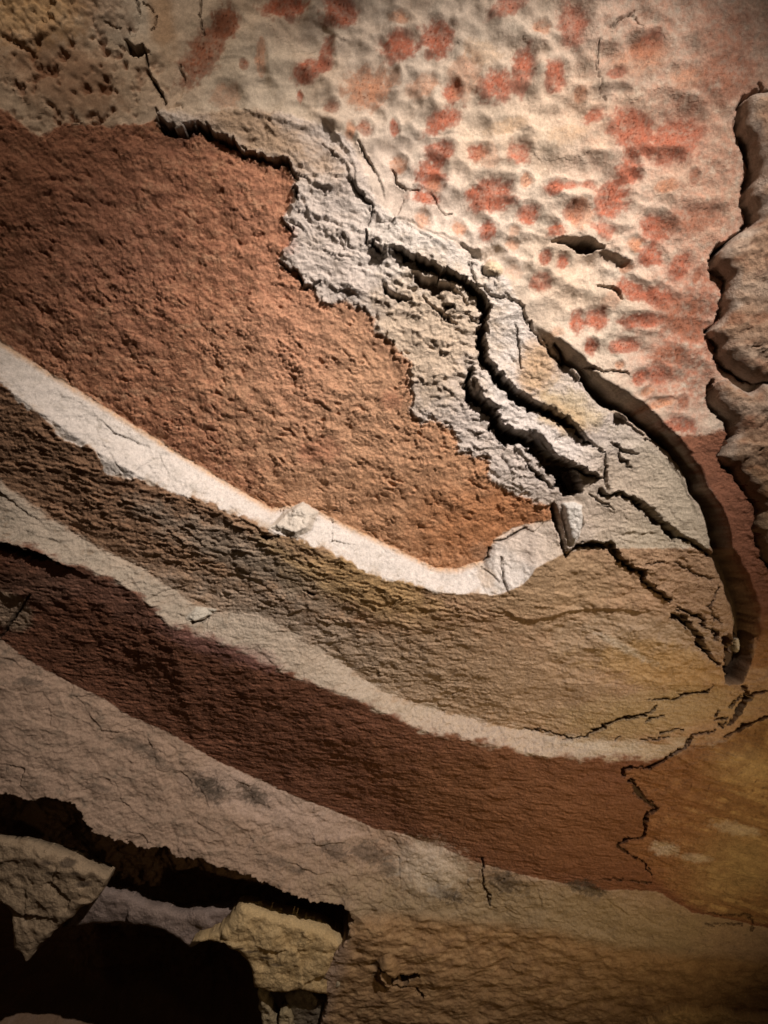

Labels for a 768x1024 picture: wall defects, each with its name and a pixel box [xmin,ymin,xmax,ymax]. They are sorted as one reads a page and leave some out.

crack [103,0,300,238]
spalling [0,108,558,569]
crack [277,259,321,291]
crack [321,81,768,886]
corrosion [517,322,597,442]
crack [475,857,492,908]